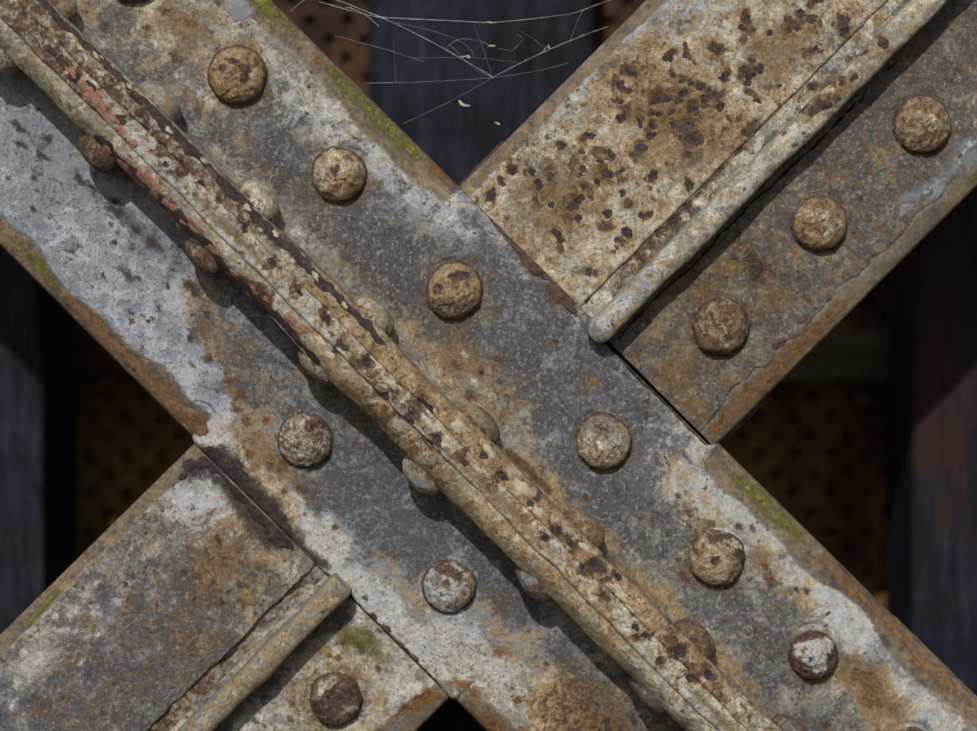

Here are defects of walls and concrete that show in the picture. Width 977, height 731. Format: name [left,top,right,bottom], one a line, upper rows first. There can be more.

rust [592,0,646,54]
rust [36,0,386,345]
rust [513,243,578,316]
rust [64,298,330,570]
rust [219,581,257,615]
rust [709,274,972,705]